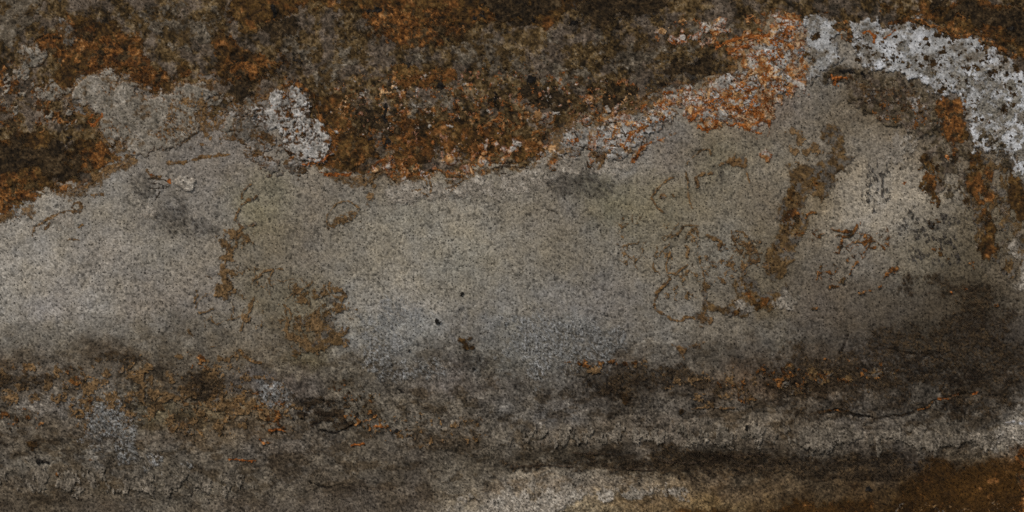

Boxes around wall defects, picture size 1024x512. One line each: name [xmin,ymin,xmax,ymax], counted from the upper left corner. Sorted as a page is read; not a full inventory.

rust [0,0,1024,223]
rust [765,123,897,290]
rust [917,91,1024,278]
rust [282,281,358,359]
leakage [463,308,626,391]
leakage [77,399,162,471]
rust [0,346,303,445]
leakage [256,380,288,408]
rust [328,379,486,449]
leakage [991,404,1024,452]
rust [891,444,1024,512]